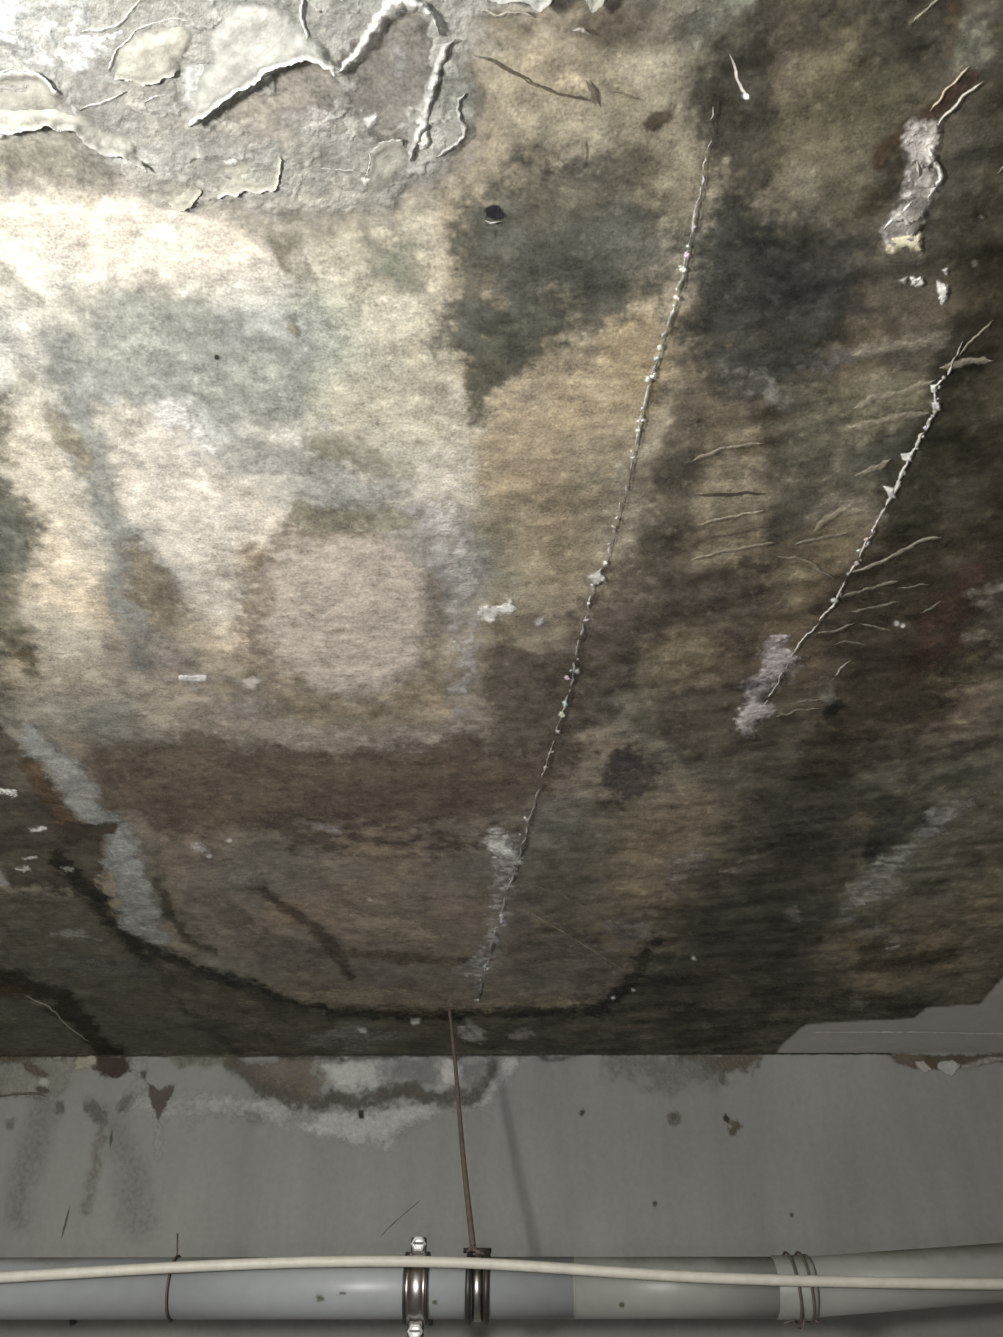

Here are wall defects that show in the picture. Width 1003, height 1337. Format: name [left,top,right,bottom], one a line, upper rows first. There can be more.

leakage [0,0,124,73]
leakage [23,287,413,698]
leakage [250,204,422,290]
peeling [0,0,716,221]
leakage [429,149,677,425]
crack [474,99,719,1002]
leakage [639,0,1003,880]
crack [764,320,993,705]
leakage [0,479,926,1151]
leakage [855,920,956,972]